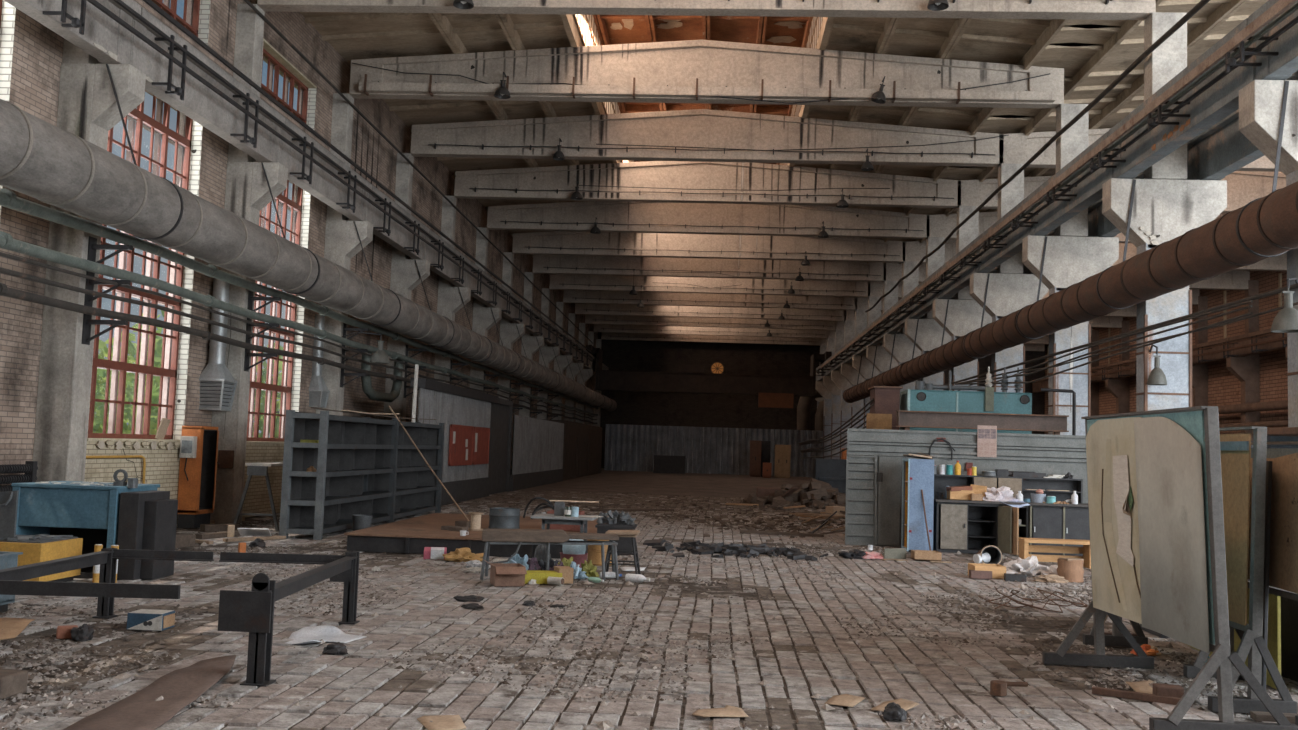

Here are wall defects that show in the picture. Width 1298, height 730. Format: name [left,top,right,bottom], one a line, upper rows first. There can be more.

damp [551,45,602,84]